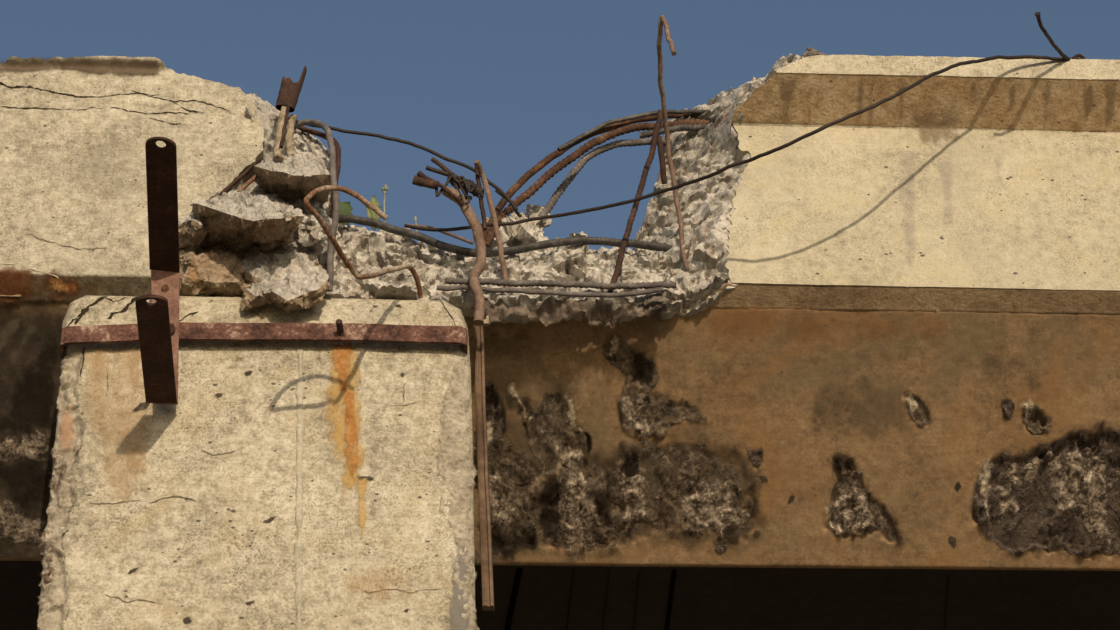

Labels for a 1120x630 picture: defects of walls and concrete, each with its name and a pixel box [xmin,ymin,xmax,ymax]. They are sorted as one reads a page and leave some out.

crack [0,82,235,125]
rust [0,268,81,302]
crack [68,296,138,397]
leakage [0,303,66,558]
rust [326,344,367,539]
spalling [437,335,768,630]
spalling [825,454,903,545]
spalling [905,394,931,426]
spalling [973,398,1120,557]